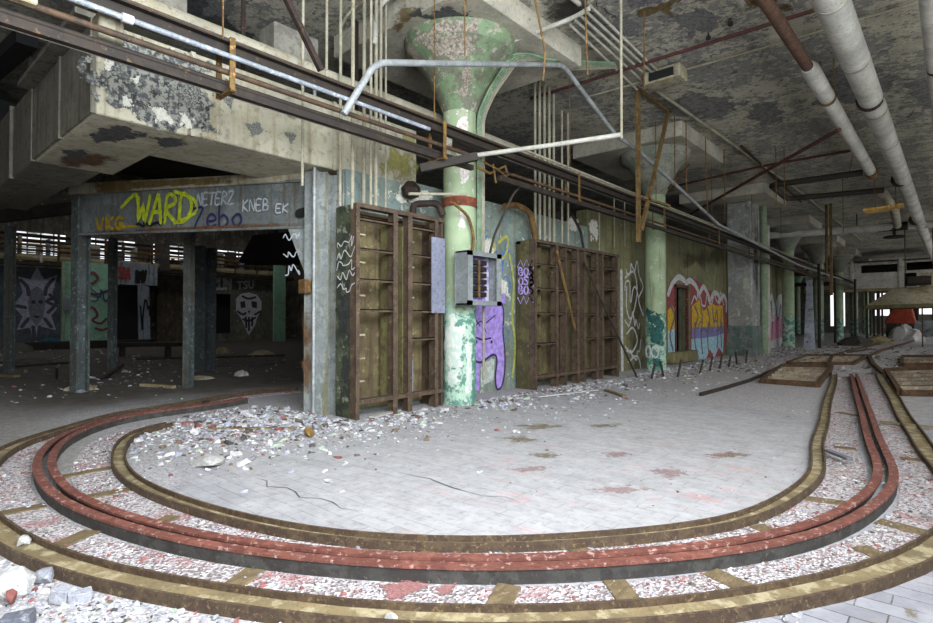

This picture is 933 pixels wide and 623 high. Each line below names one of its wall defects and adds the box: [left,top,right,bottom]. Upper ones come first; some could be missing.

peeling [612,0,670,37]
peeling [657,7,732,38]
peeling [122,31,213,73]
peeling [393,6,481,97]
peeling [76,55,234,148]
peeling [456,108,469,131]
peeling [647,85,788,128]
peeling [824,66,856,104]
peeling [875,69,931,116]
peeling [458,167,470,188]
peeling [443,305,472,395]
peeling [646,308,664,367]